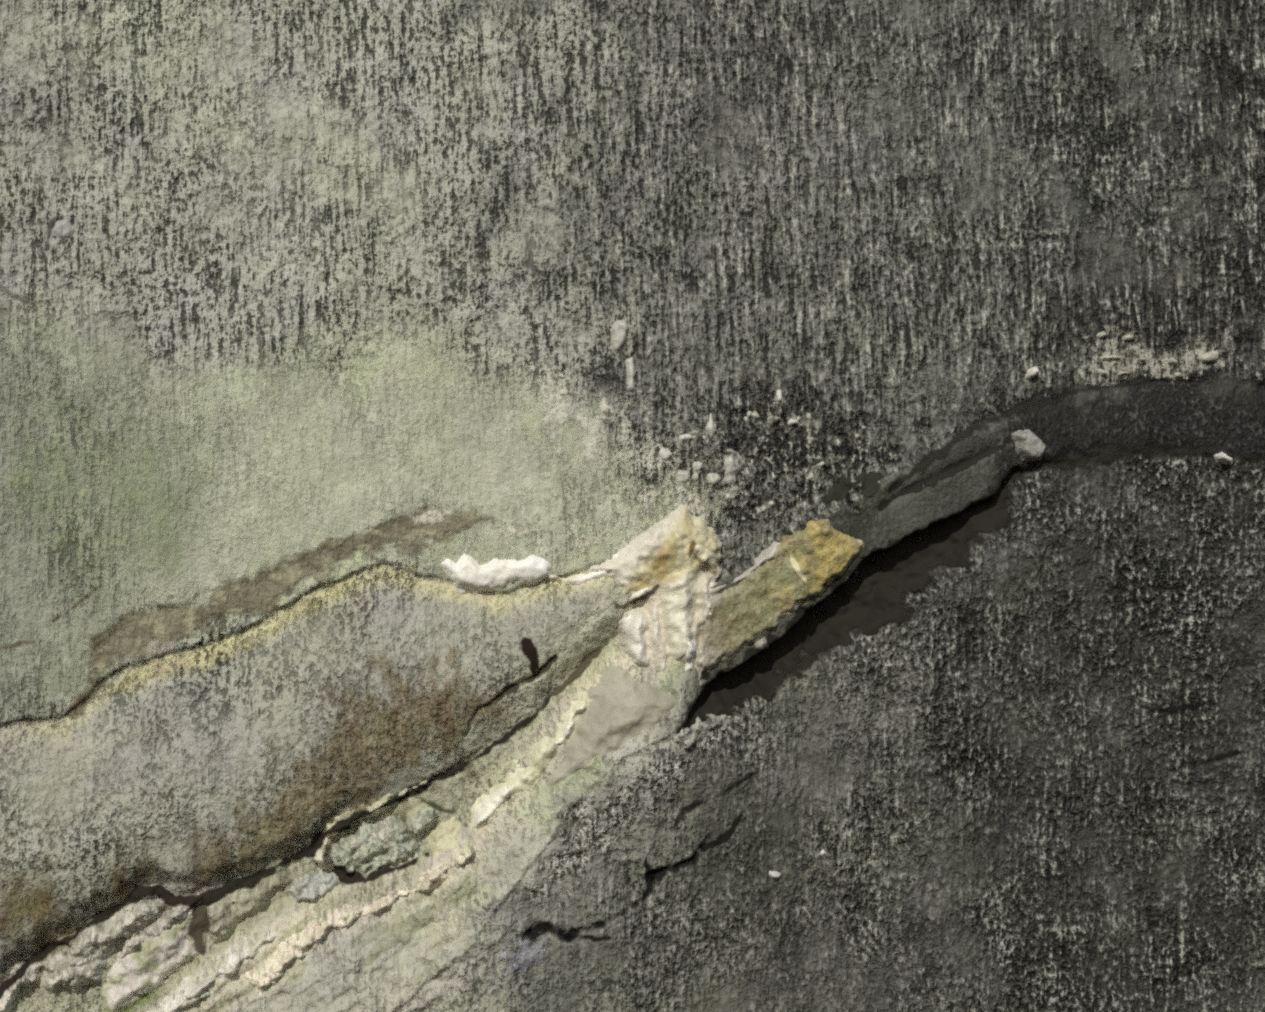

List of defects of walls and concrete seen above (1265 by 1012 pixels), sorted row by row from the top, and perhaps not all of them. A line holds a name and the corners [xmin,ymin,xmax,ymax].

damp [738,390,811,431]
peeling [1012,429,1046,462]
crack [53,586,101,620]
damp [0,337,753,719]
spalling [699,519,864,672]
rust [189,649,502,885]
spalling [524,714,732,907]
spalling [0,870,339,1012]